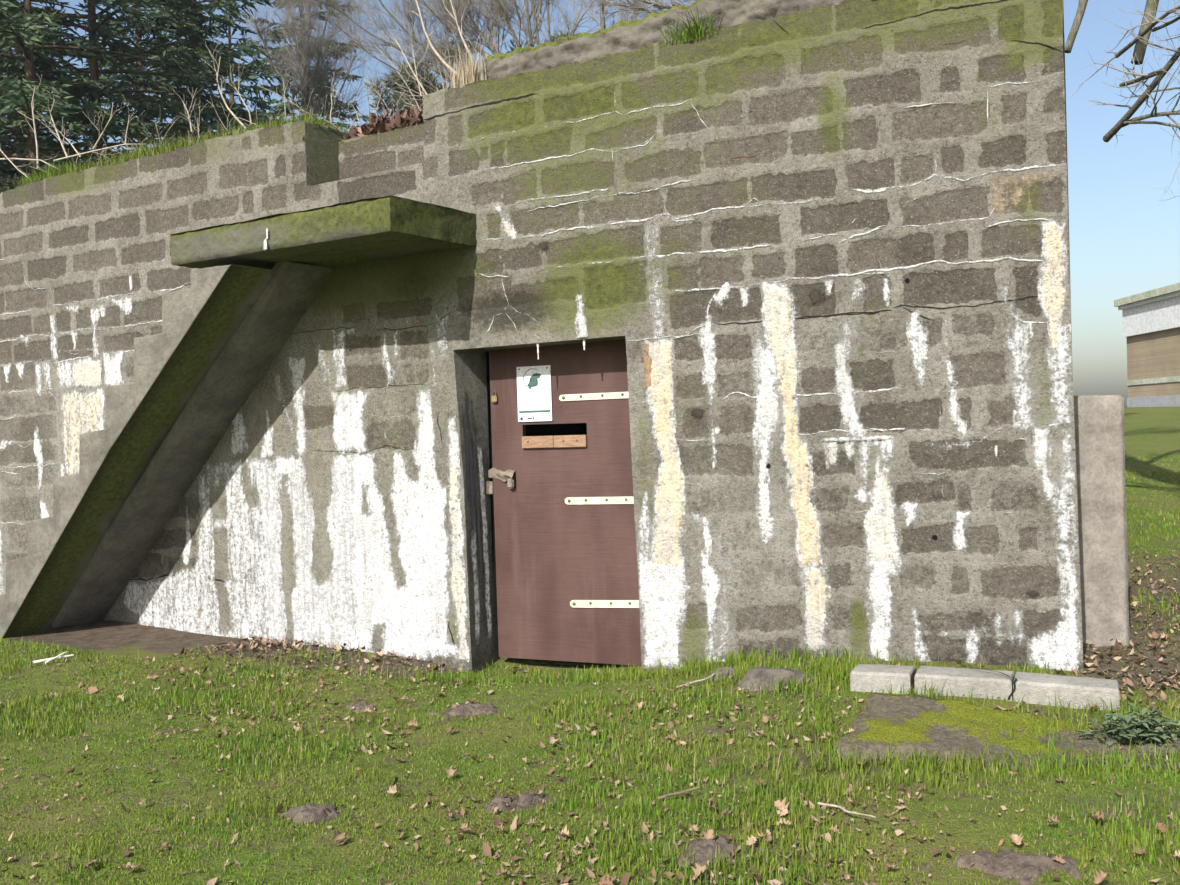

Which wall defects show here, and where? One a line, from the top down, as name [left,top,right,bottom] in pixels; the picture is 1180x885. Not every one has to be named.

crack [492,93,709,169]
crack [490,179,816,240]
crack [638,245,768,258]
crack [806,161,1065,243]
crack [627,257,1049,341]
leakage [3,276,132,476]
crack [722,361,943,400]
leakage [906,311,928,386]
leakage [123,329,491,662]
leakage [639,281,728,669]
leakage [714,281,918,661]
leakage [996,221,1080,671]